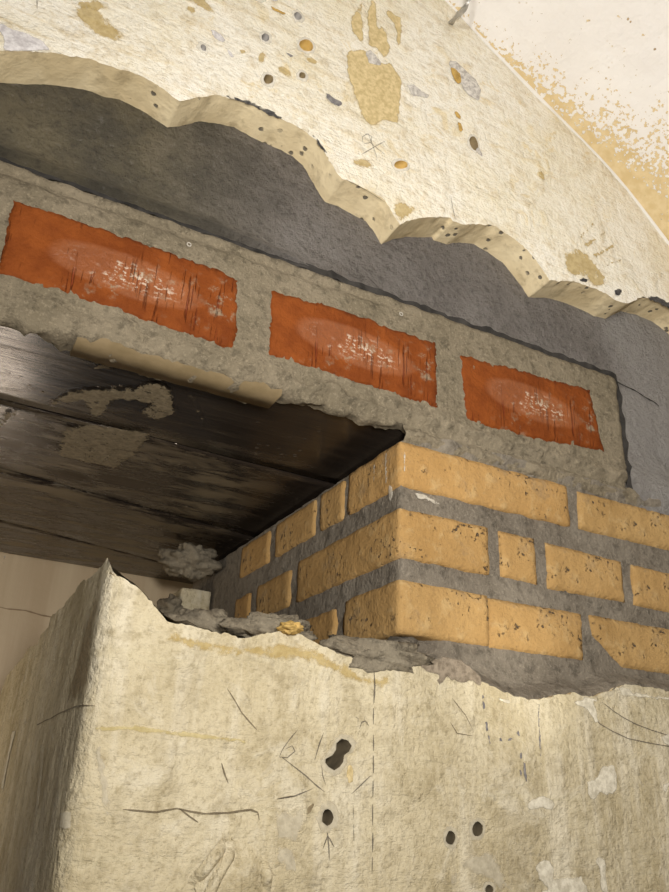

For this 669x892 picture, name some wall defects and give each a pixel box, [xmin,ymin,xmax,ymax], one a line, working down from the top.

peeling [0,24,49,51]
peeling [347,0,429,125]
peeling [449,1,669,240]
water stain [565,232,613,286]
peeling [575,697,598,722]
peeling [588,765,617,799]
crack [123,808,260,822]
spalling [444,826,458,848]
spalling [470,818,485,840]
peeling [536,860,587,892]
peeling [596,857,608,892]